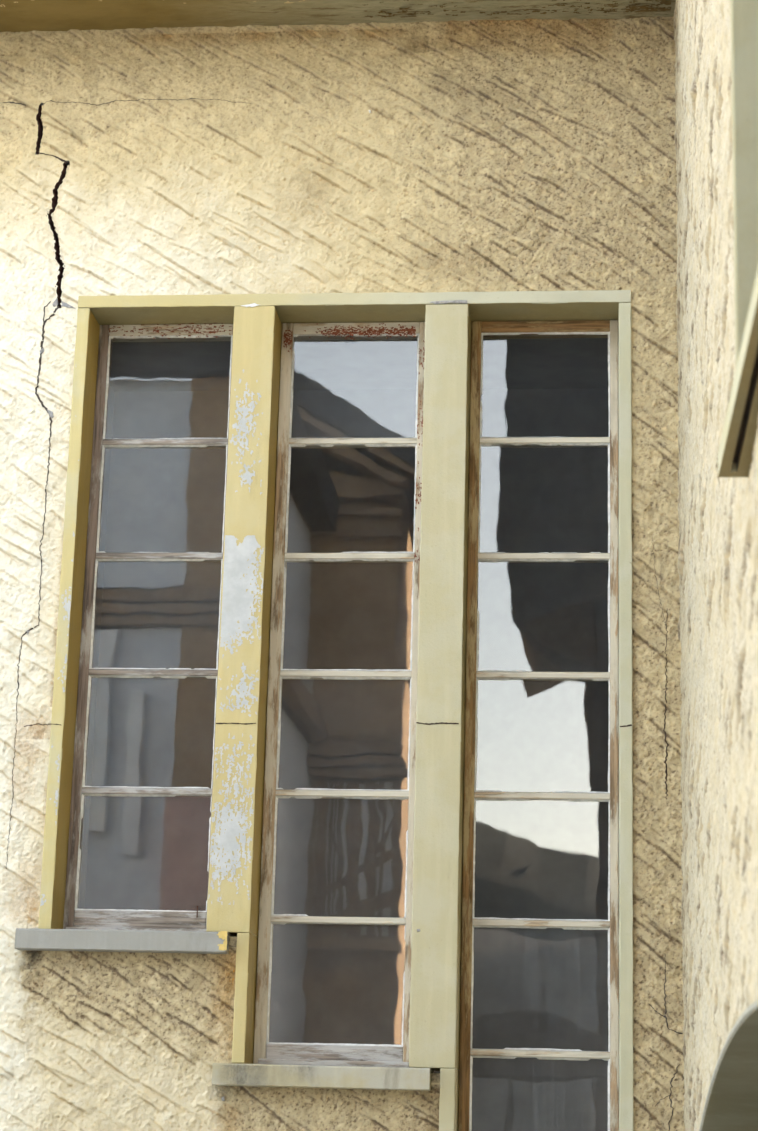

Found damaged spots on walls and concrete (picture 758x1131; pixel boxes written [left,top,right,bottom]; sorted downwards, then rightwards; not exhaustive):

crack [3,98,251,869]
peeling [230,369,263,495]
peeling [219,535,264,717]
peeling [208,733,255,905]
crack [649,961,682,1034]
crack [656,1064,680,1131]